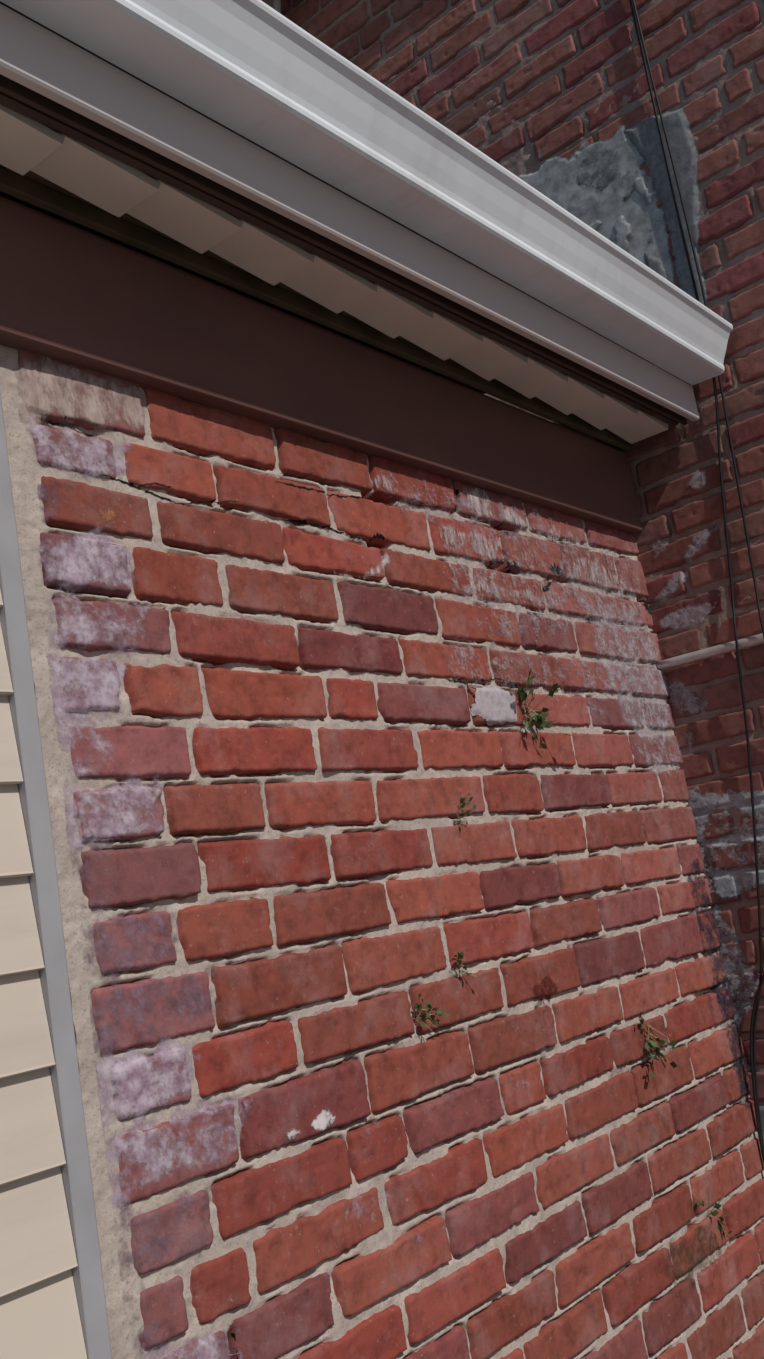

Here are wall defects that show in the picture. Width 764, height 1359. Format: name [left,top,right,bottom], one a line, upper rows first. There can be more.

peeling [518,126,674,284]
crack [37,384,103,439]
crack [103,474,238,505]
crack [276,481,366,541]
leakage [690,471,706,488]
leakage [443,488,717,774]
leakage [687,787,764,1028]